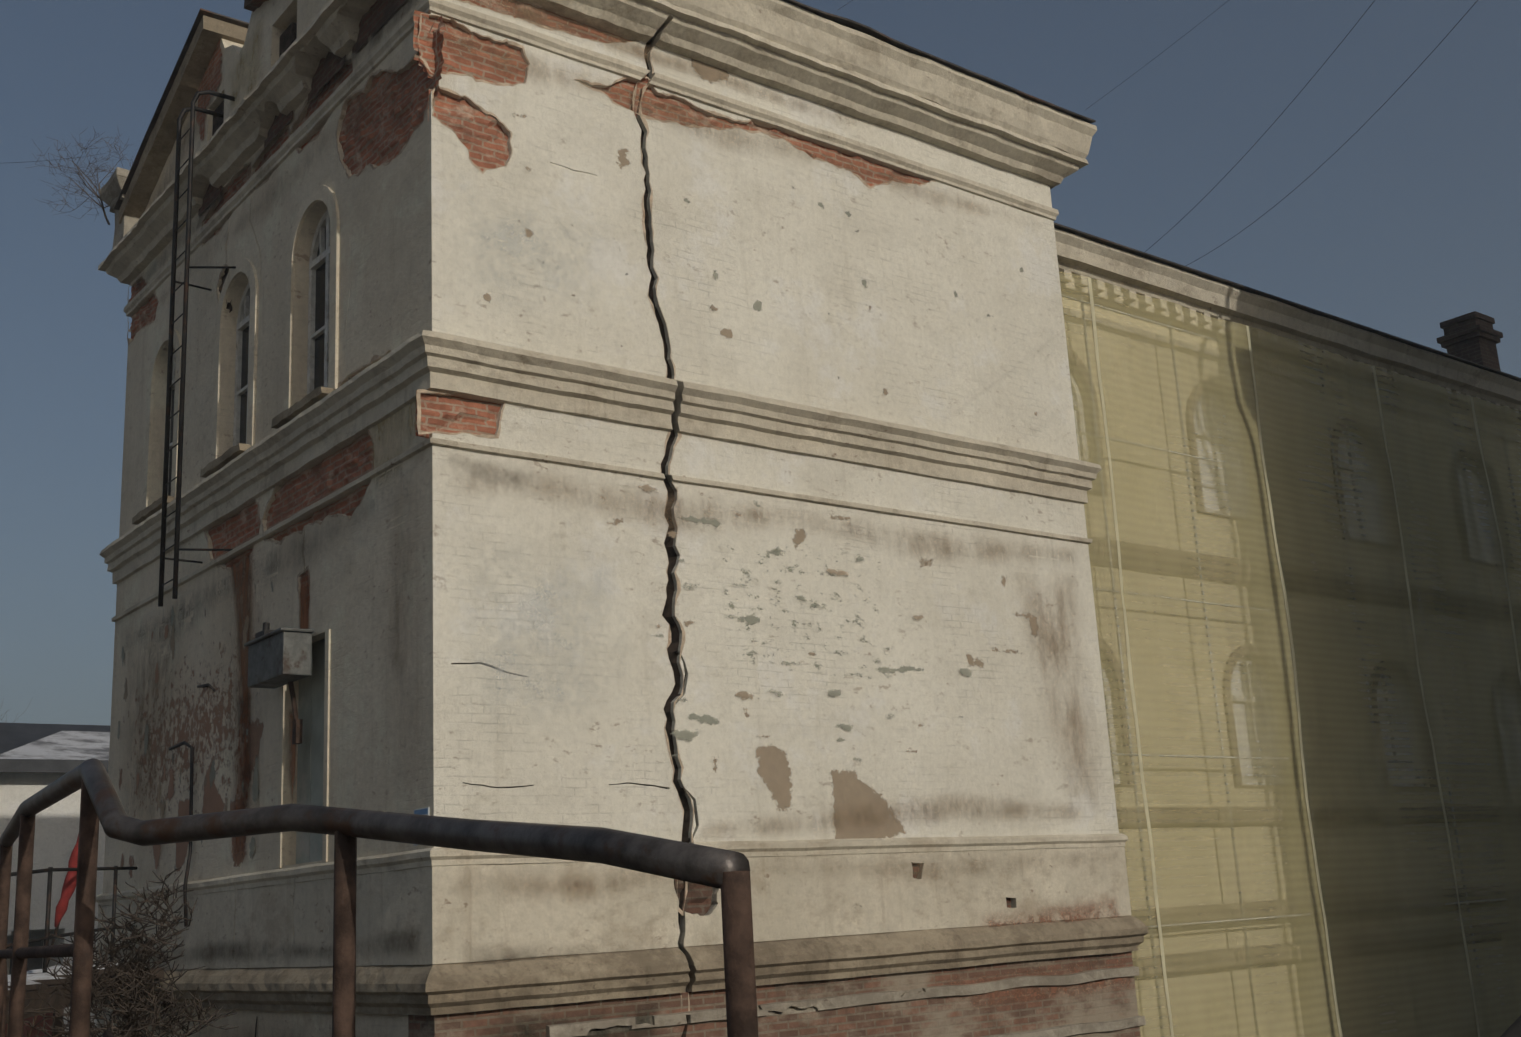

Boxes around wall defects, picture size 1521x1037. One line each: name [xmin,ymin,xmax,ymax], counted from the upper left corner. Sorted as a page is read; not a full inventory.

flaking render [458,0,639,44]
flaking render [202,10,530,247]
flaking render [573,75,936,189]
flaking render [415,389,505,439]
crack [609,37,695,843]
flaking render [204,430,375,571]
peeling [723,528,880,673]
peeling [117,607,264,818]
peeling [756,736,792,811]
peeling [831,758,905,839]
crack [674,879,688,948]
flaking render [674,879,713,916]